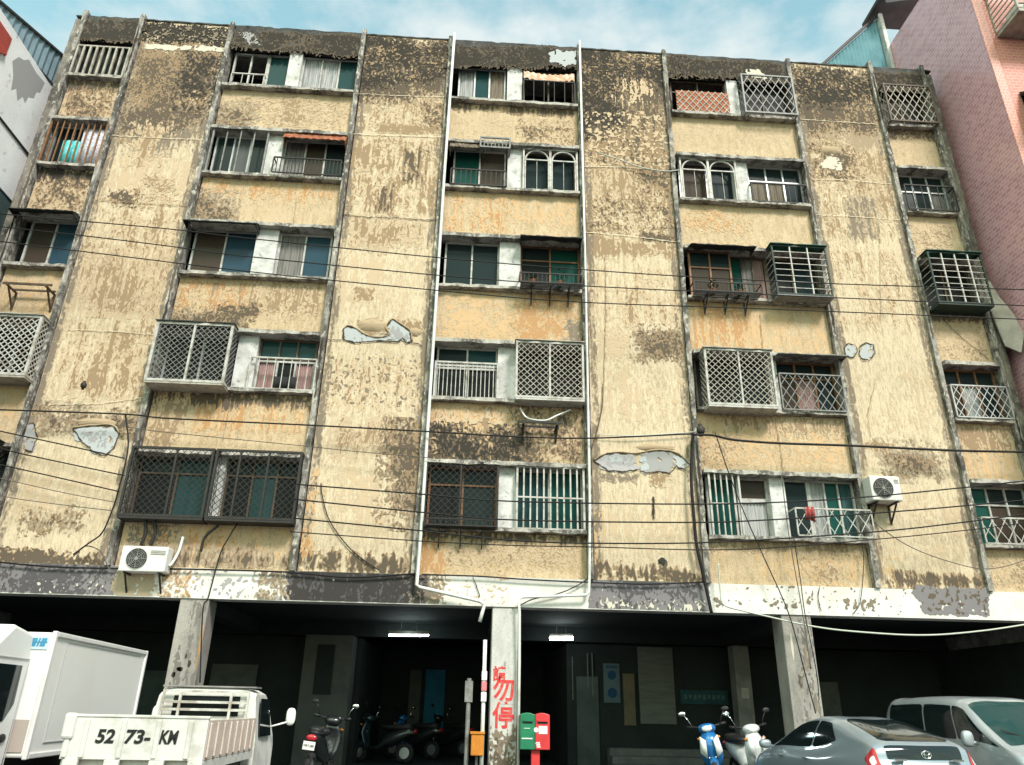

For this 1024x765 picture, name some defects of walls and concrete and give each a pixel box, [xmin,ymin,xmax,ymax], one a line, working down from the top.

peeling [548,49,576,67]
damp [0,17,1024,605]
peeling [344,319,410,343]
peeling [845,343,874,359]
peeling [23,424,38,452]
peeling [72,426,119,454]
peeling [595,451,689,475]
spalling [763,584,991,617]